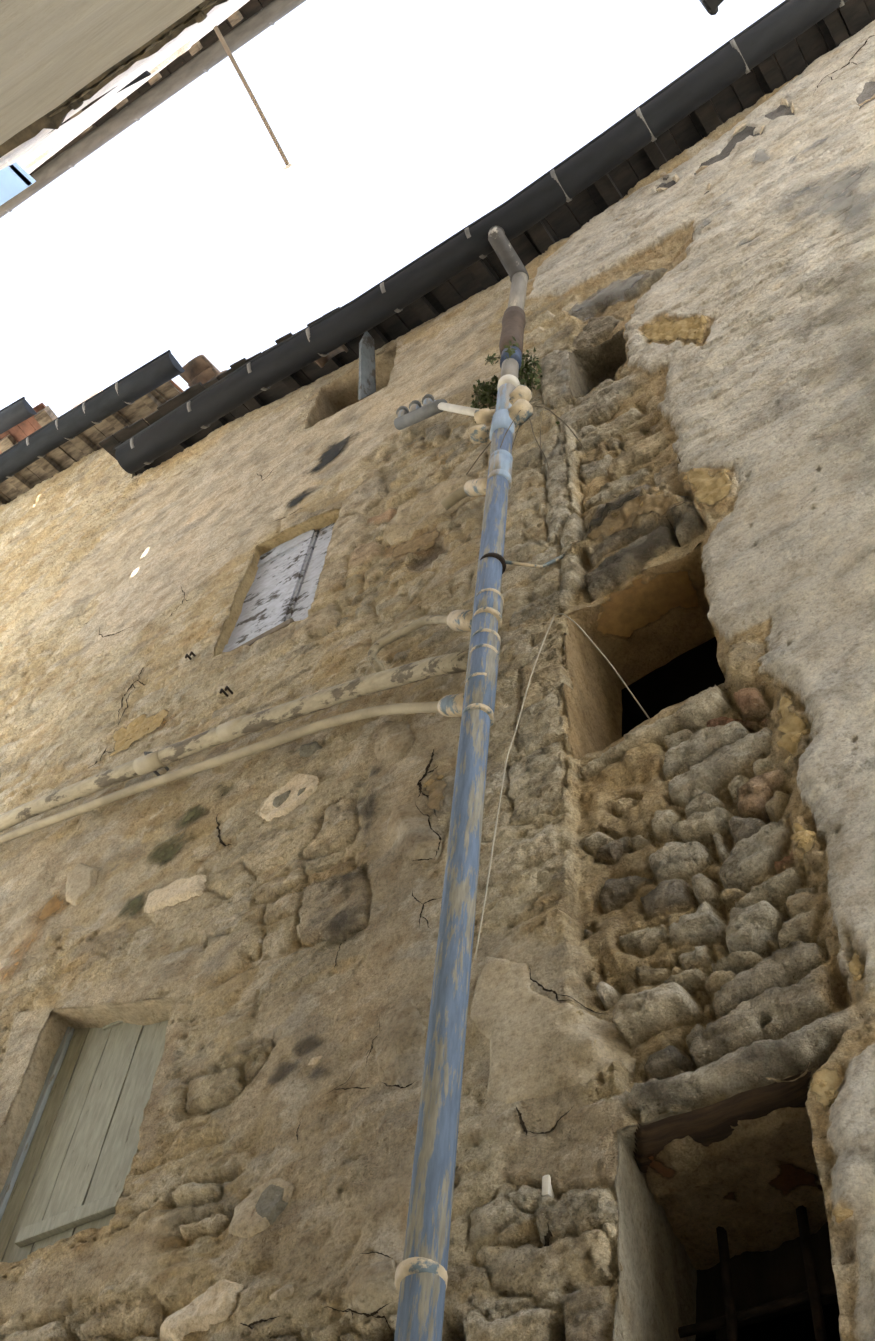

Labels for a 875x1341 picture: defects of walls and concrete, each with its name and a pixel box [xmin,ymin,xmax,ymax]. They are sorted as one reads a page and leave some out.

spalling [643,315,708,343]
spalling [572,468,732,545]
spalling [777,696,811,764]
crack [417,749,438,815]
spalling [790,822,816,857]
crack [529,968,602,1014]
crack [516,1107,572,1136]